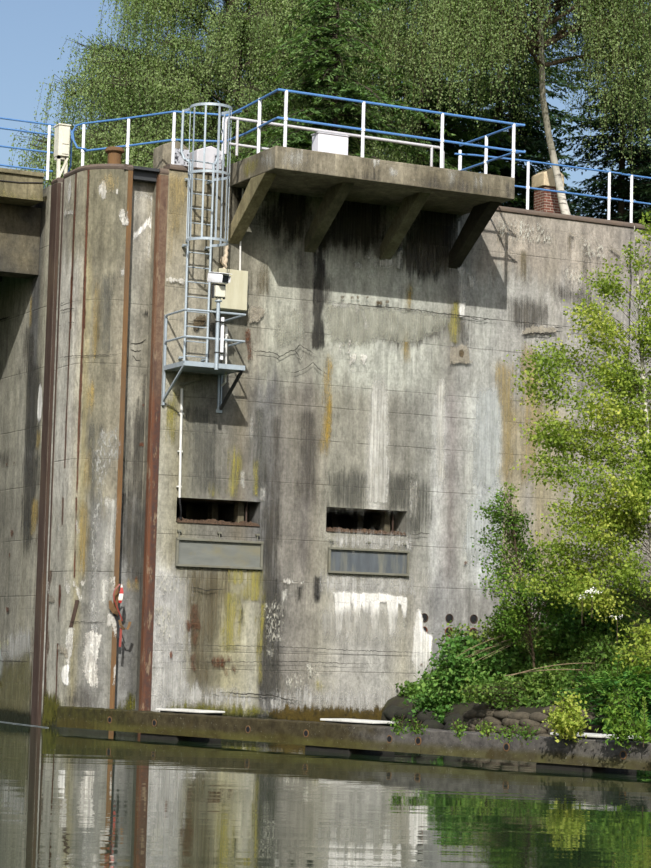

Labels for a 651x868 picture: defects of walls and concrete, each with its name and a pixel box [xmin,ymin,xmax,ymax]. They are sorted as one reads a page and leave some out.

damp [231,188,246,210]
damp [259,193,312,244]
damp [312,201,474,348]
crack [253,345,327,374]